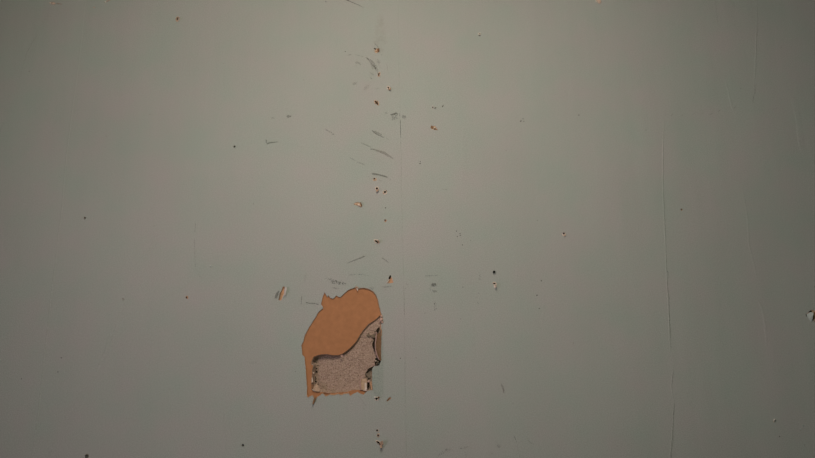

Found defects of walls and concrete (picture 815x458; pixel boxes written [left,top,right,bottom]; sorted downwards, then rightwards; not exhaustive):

flaking render [301,286,383,404]